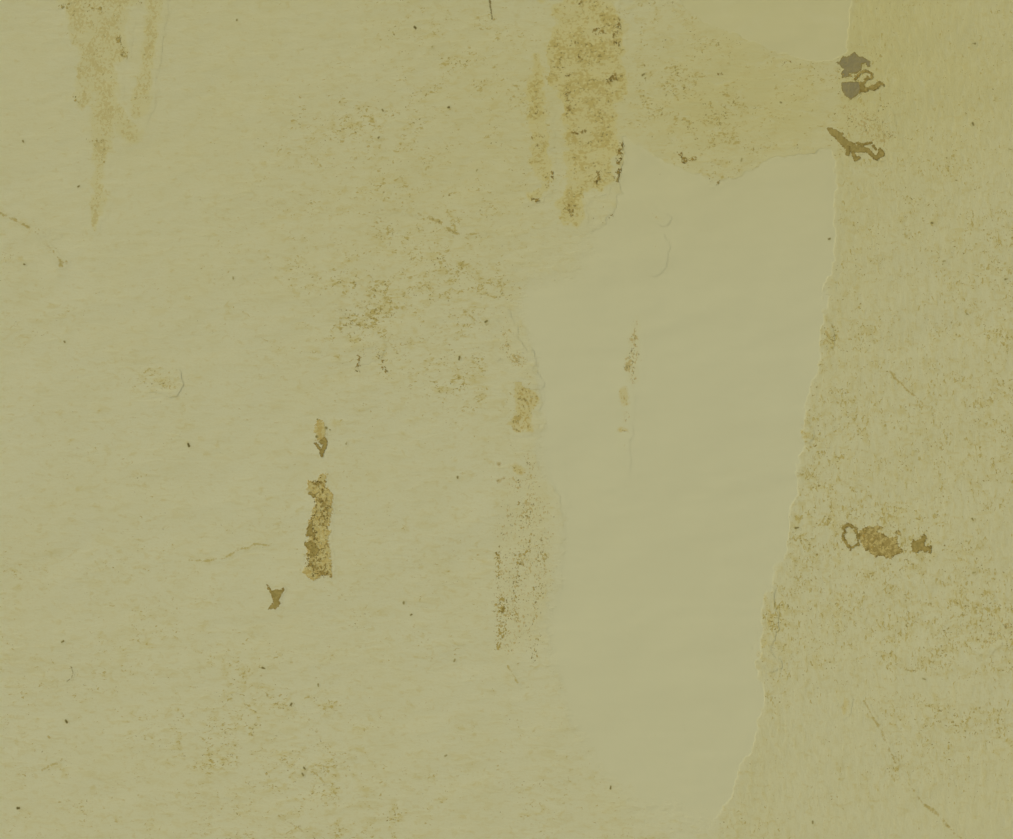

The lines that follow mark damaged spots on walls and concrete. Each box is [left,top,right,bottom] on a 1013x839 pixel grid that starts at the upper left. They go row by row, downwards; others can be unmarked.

water stain [51,0,169,237]
water stain [518,0,634,233]
peeling [624,0,911,190]
spalling [311,415,331,457]
spalling [264,581,287,611]
spalling [297,469,336,583]
spalling [841,520,932,562]